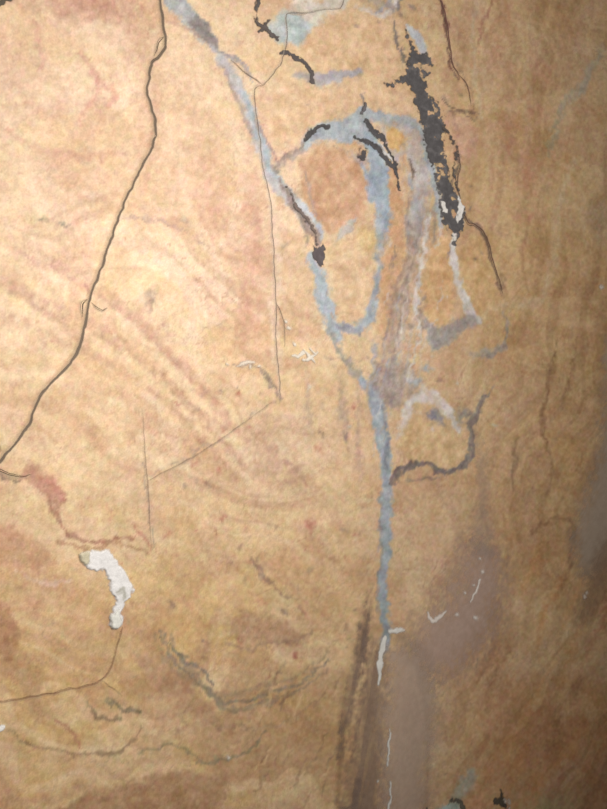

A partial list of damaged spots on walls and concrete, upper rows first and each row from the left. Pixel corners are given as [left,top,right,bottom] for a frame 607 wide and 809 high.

peeling [254,0,279,41]
peeling [280,50,315,84]
peeling [384,29,465,246]
crack [0,0,167,477]
peeling [80,550,135,629]
peeling [493,789,511,809]